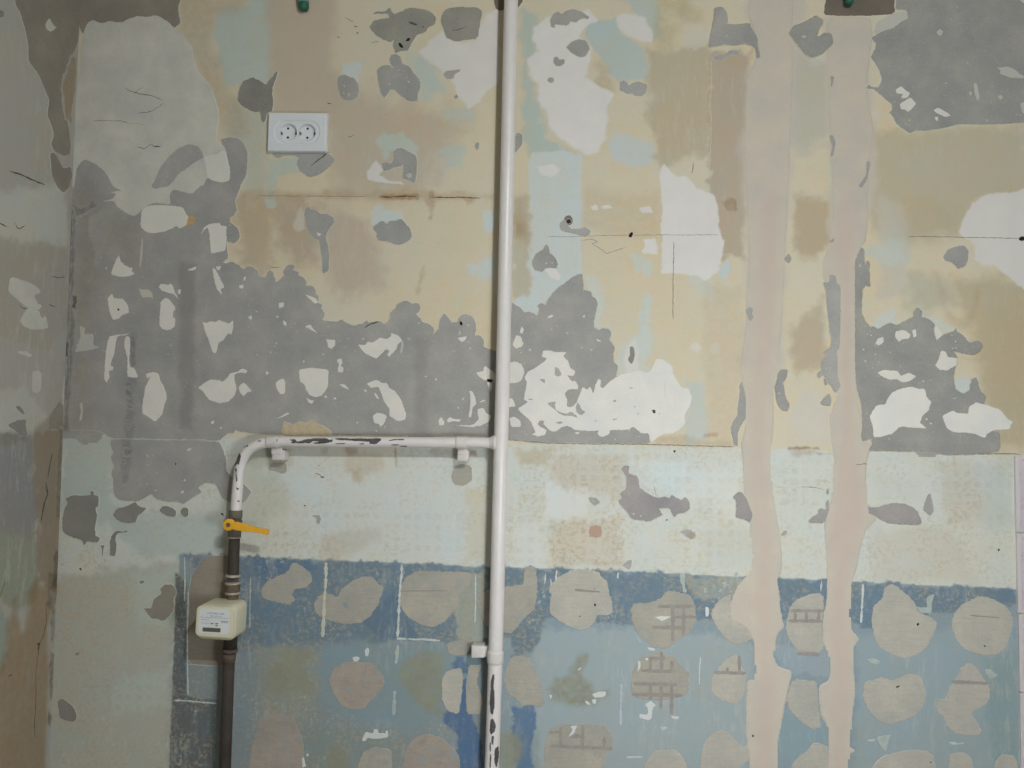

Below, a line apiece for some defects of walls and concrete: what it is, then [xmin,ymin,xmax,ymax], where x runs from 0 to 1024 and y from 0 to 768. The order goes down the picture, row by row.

peeling [547,39,590,83]
peeling [550,8,589,28]
peeling [789,0,1024,134]
corrosion [237,183,500,222]
peeling [61,136,496,557]
peeling [508,273,650,445]
peeling [854,245,1012,456]
crack [41,453,53,521]
peeling [144,554,231,667]
peeling [489,675,499,768]